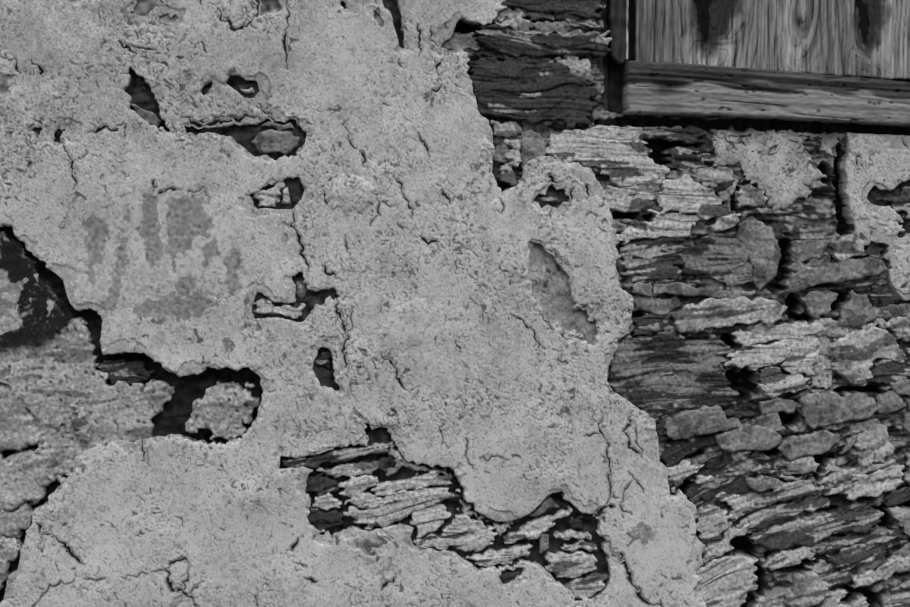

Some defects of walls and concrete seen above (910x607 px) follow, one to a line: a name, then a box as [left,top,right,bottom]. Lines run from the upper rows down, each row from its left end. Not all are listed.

spalling [382,0,404,49]
crack [0,55,45,77]
spalling [125,68,170,132]
spalling [184,119,307,161]
spalling [250,177,305,209]
spalling [252,272,338,322]
spalling [441,0,910,607]
spalling [0,226,263,602]
crack [584,410,645,519]
spalling [279,423,609,599]
crack [31,522,204,607]
crack [607,540,674,607]